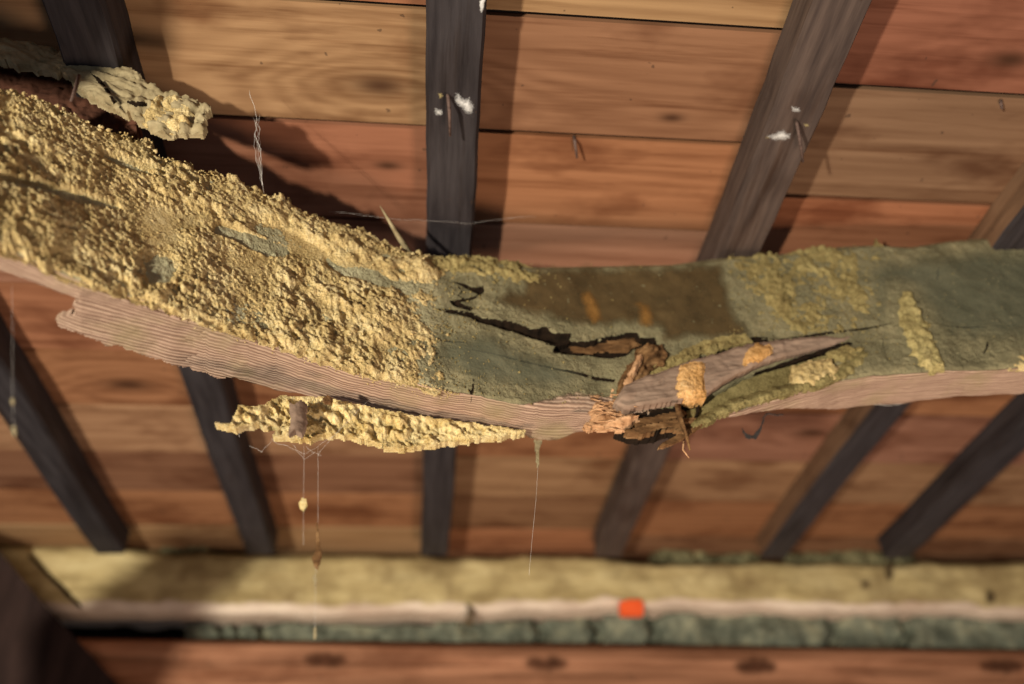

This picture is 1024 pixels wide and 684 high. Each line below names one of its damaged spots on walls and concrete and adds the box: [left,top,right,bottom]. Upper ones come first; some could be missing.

crack [439,282,656,382]
leakage [501,267,744,339]
crack [699,323,891,376]
crack [613,405,699,445]